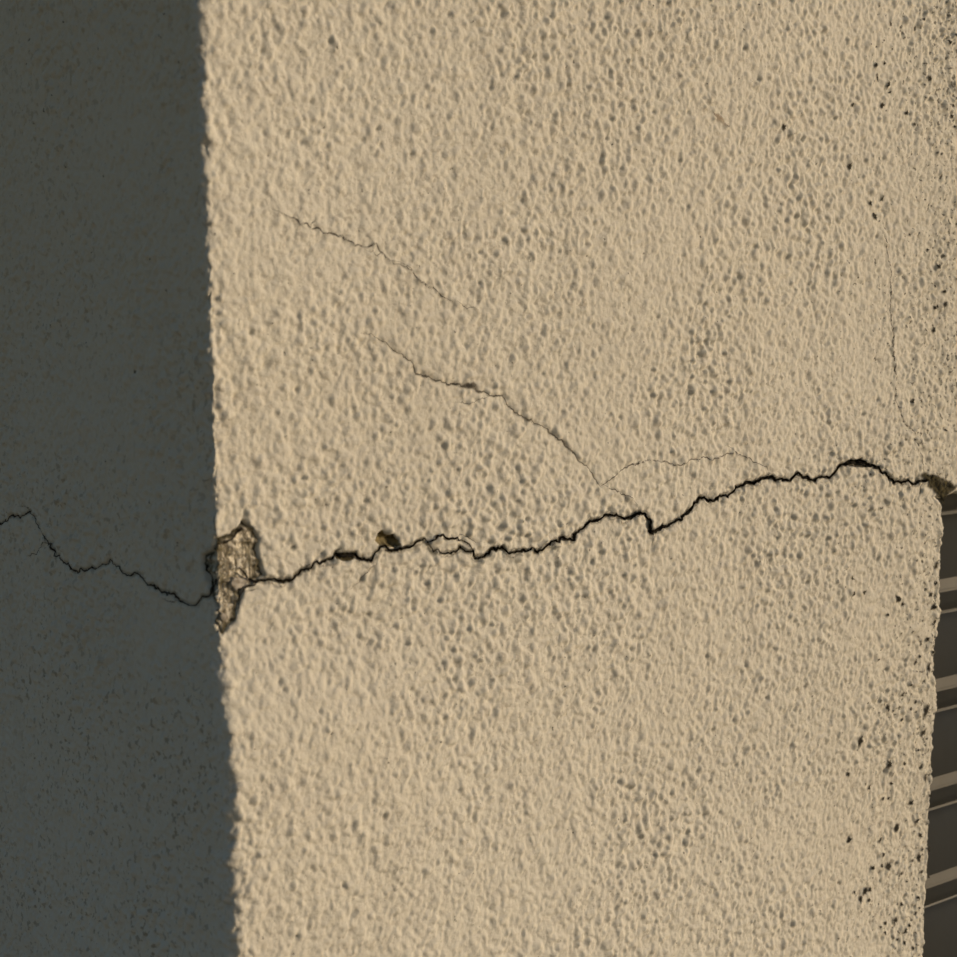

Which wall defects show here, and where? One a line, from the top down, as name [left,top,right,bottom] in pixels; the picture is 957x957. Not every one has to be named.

crack [275,210,475,309]
crack [0,238,929,610]
spalling [204,520,262,634]